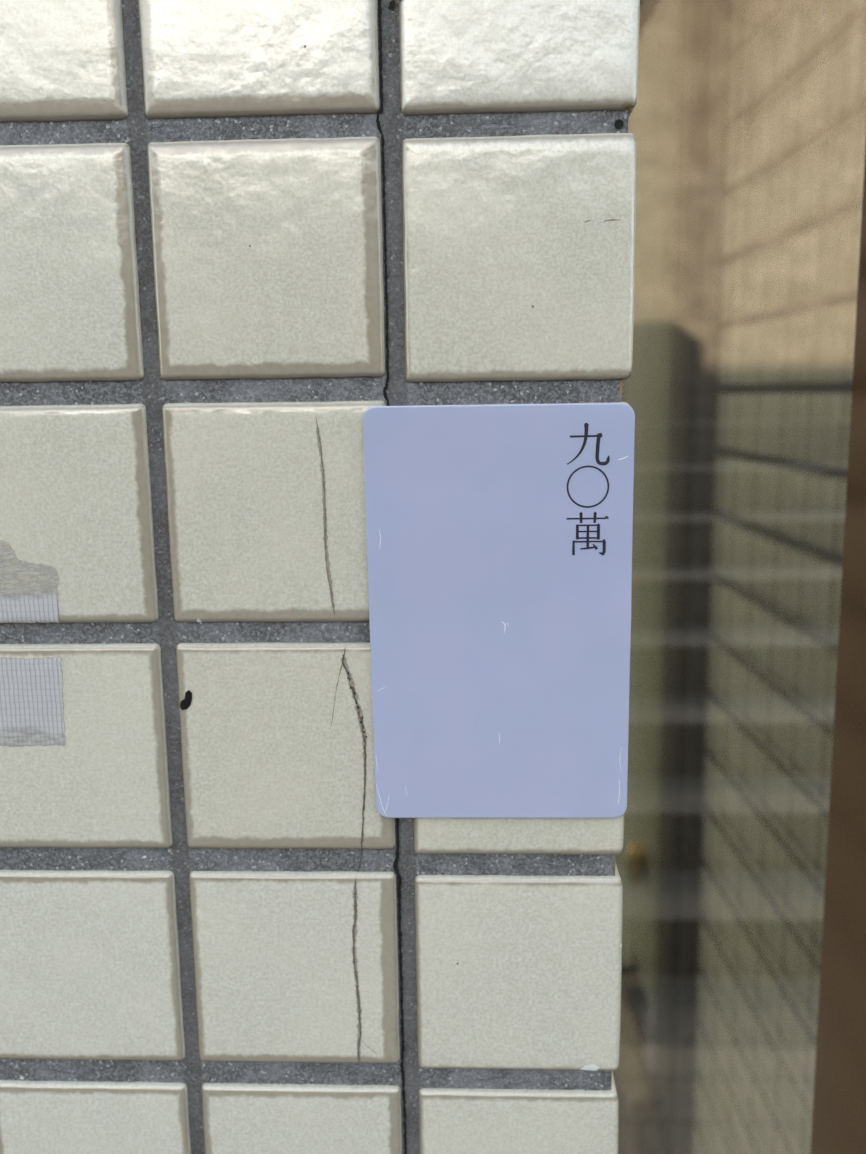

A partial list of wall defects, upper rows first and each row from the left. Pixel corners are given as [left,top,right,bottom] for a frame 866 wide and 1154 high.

crack [388,0,401,10]
crack [316,418,335,615]
crack [331,649,374,1063]